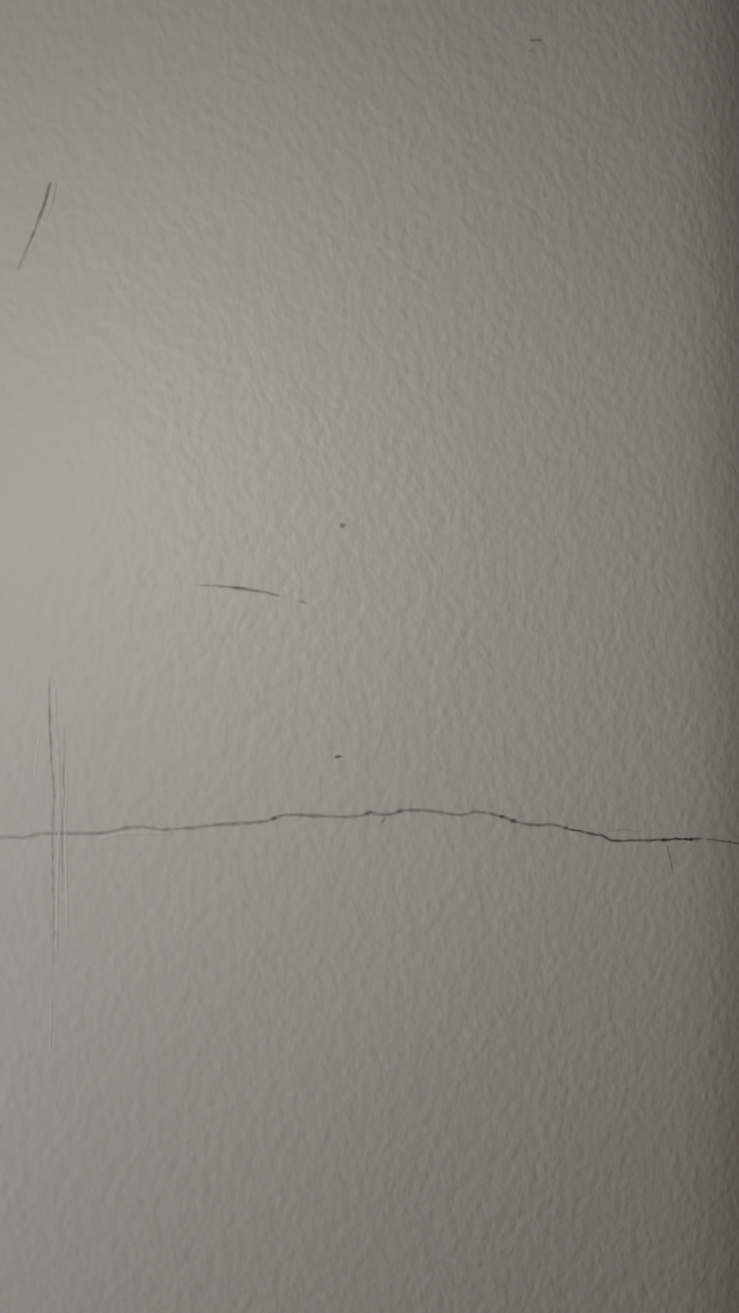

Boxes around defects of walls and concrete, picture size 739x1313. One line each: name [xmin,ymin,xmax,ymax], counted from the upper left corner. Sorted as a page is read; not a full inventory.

crack [570,829,694,848]